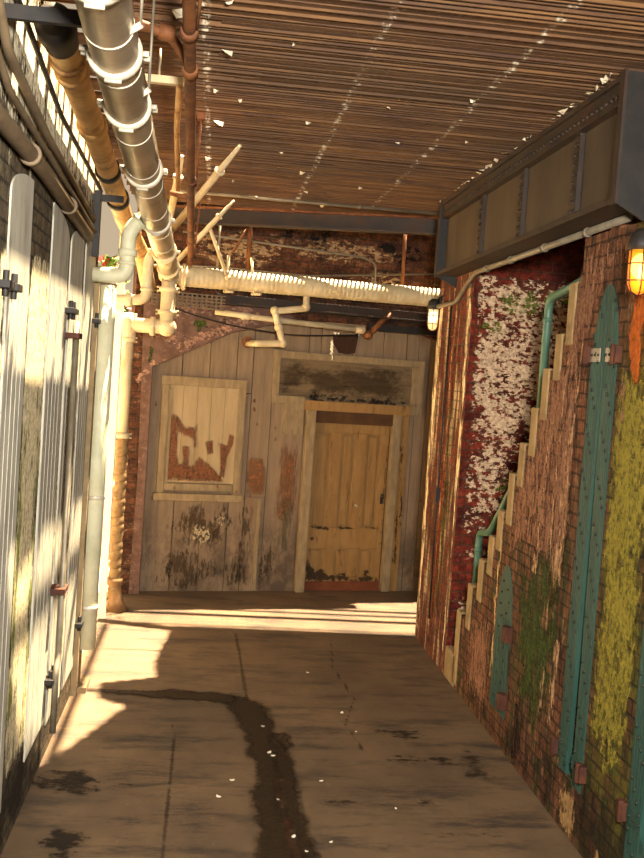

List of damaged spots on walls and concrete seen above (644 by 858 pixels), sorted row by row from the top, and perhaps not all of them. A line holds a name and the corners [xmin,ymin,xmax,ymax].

corrosion [629,295,644,383]
peeling [418,308,443,607]
peeling [451,238,637,700]
damp [156,506,274,589]
damp [0,722,99,846]
damp [38,829,86,858]
damp [87,688,321,858]